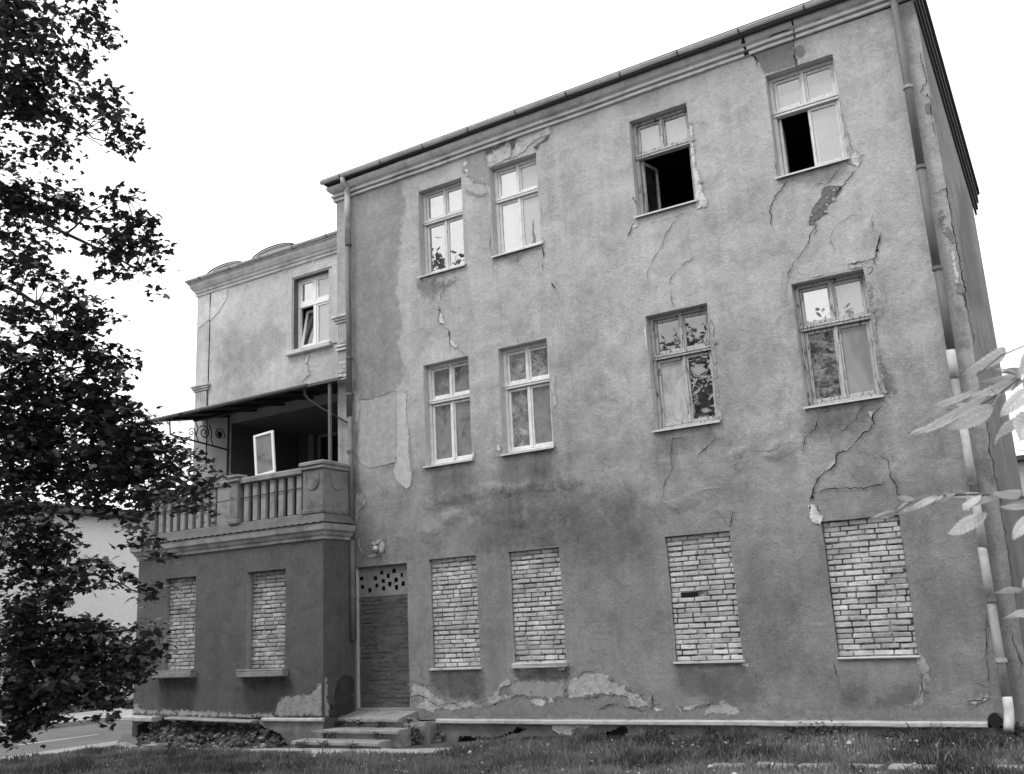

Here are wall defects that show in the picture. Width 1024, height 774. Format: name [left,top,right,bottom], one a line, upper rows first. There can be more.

peeling [462,126,551,185]
crack [627,197,698,303]
spalling [689,121,708,209]
crack [769,153,788,234]
spalling [809,185,842,225]
crack [787,215,882,278]
crack [934,187,975,340]
crack [660,437,716,503]
crack [808,406,900,514]
crack [986,422,1016,602]
spalling [132,673,356,719]
peeling [409,650,989,736]